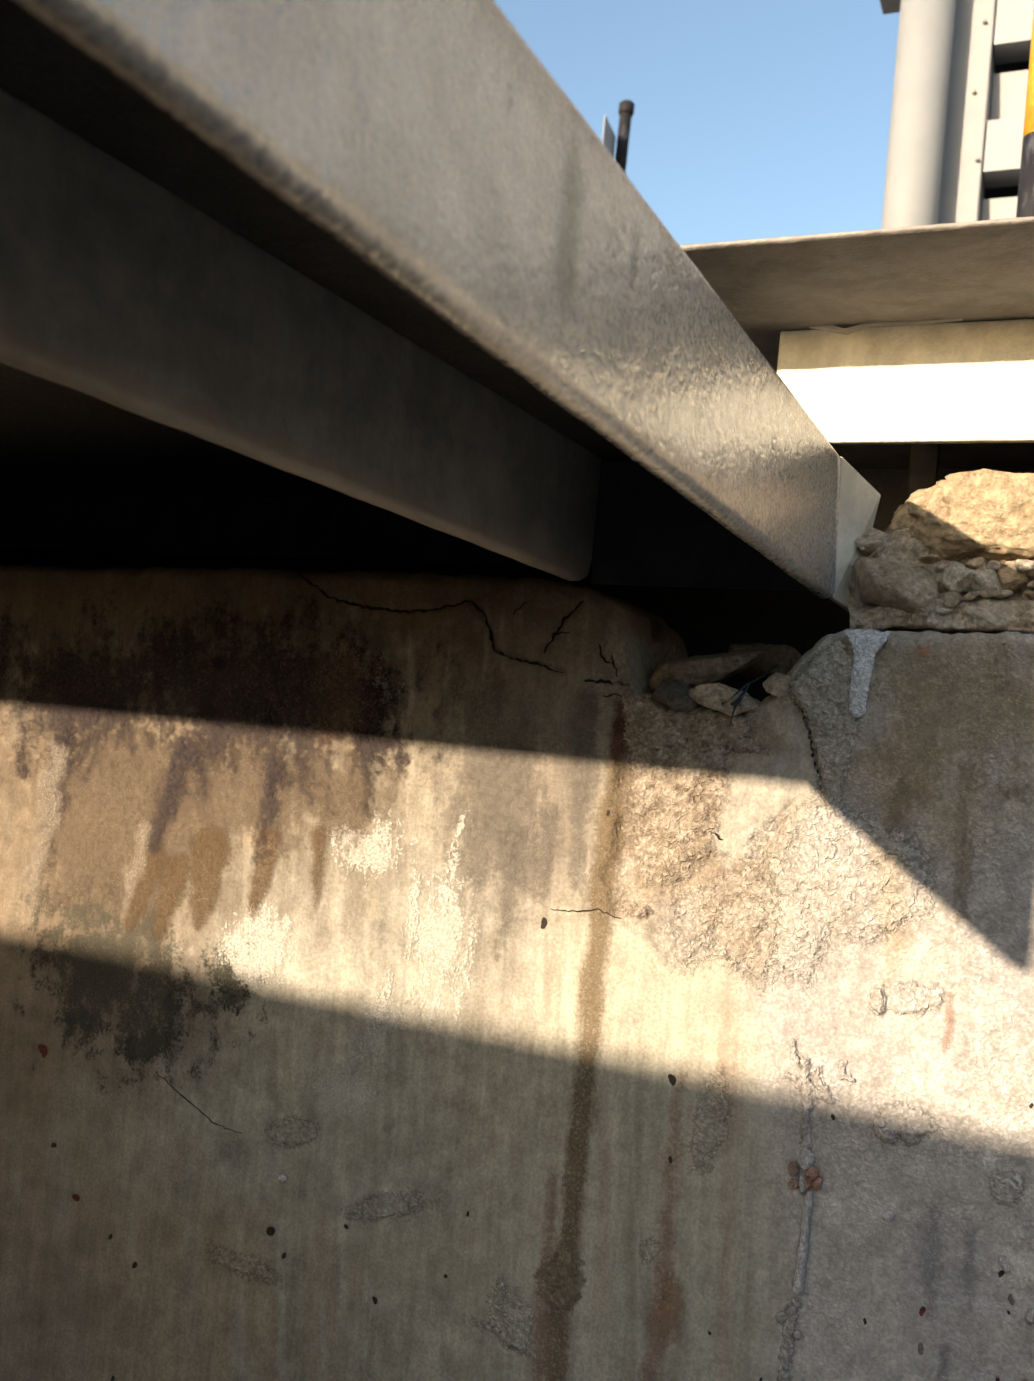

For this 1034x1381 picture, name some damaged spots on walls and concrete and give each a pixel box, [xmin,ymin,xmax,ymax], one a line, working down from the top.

spalling [856,470,909,532]
spalling [938,469,1034,481]
peeling [936,557,1034,616]
crack [295,572,630,698]
peeling [0,549,941,1003]
crack [801,710,819,777]
leakage [0,599,628,1269]
leakage [532,1287,570,1381]